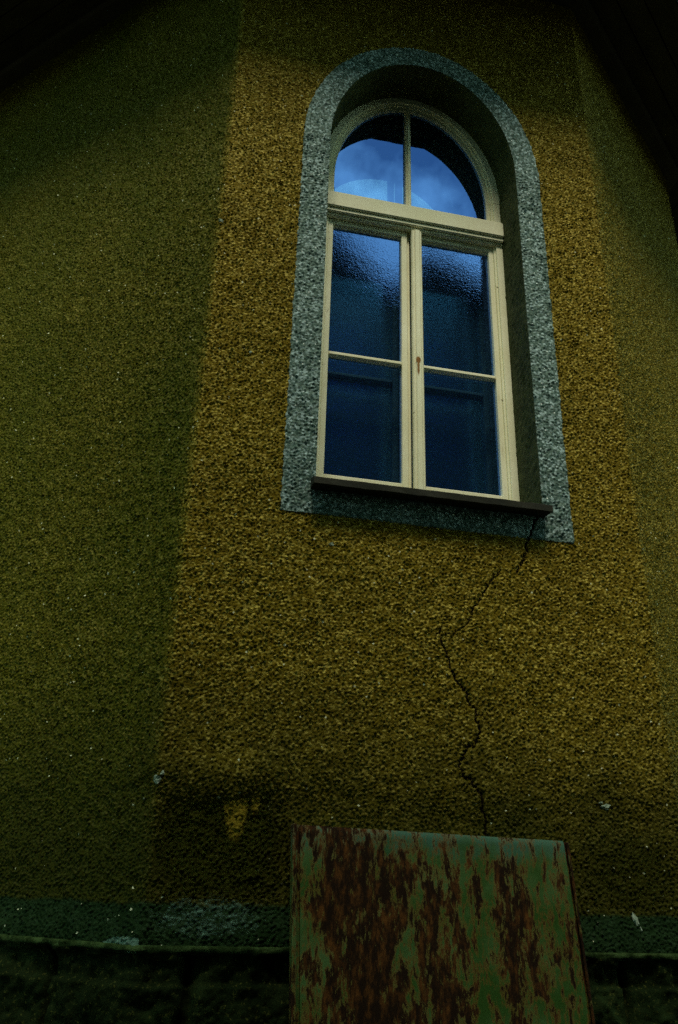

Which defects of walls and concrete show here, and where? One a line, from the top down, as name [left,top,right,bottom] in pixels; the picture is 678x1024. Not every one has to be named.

crack [435,517,538,836]